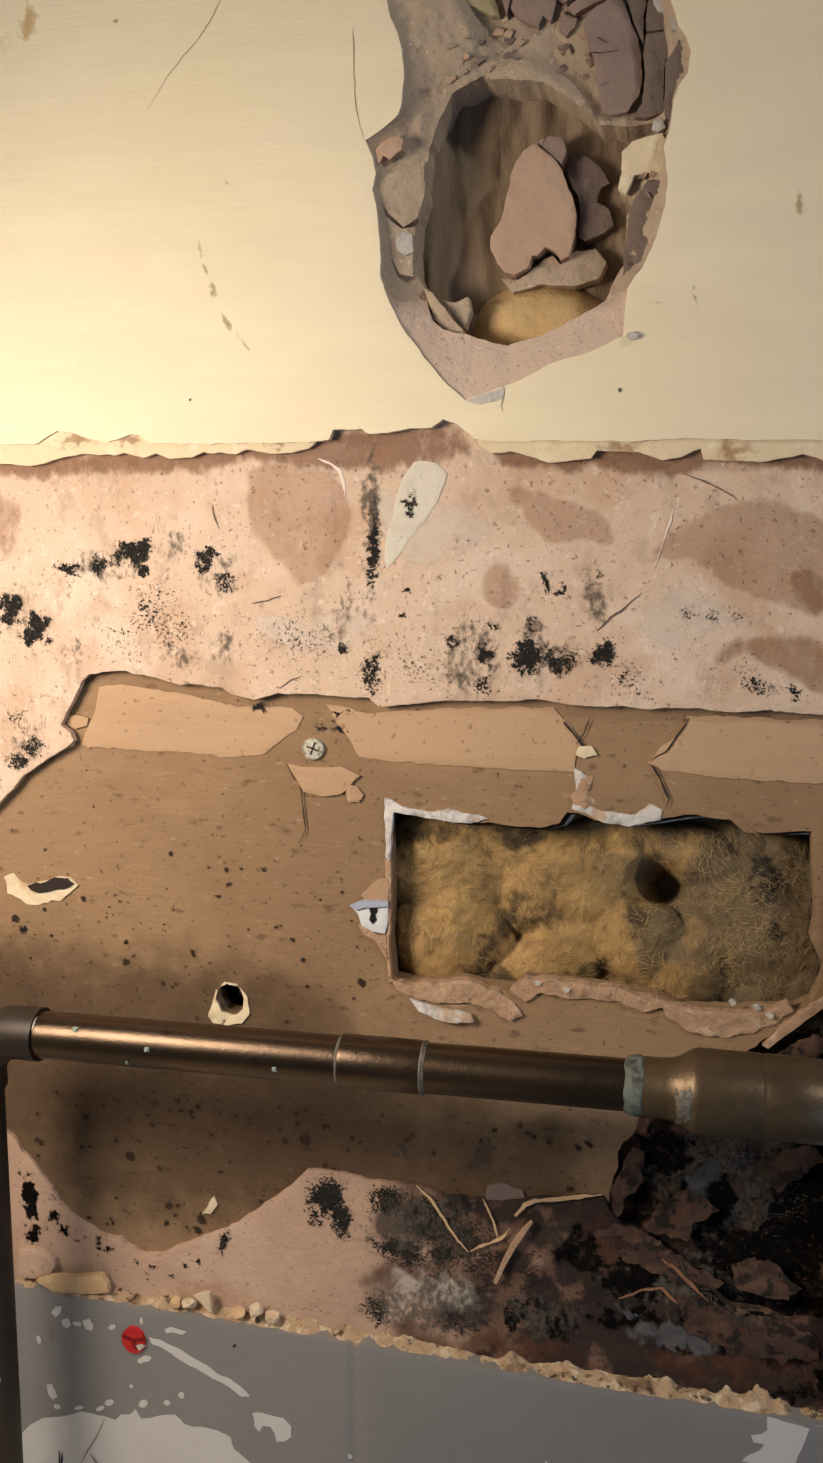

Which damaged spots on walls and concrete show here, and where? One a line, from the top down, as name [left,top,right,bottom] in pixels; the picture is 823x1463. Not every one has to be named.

crack [147,0,221,110]
spalling [366,0,691,404]
peeling [0,431,317,466]
peeling [477,438,823,463]
leakage [0,428,465,697]
mould [445,570,618,699]
spalling [4,873,79,905]
leakage [164,1202,206,1234]
leakage [303,1120,823,1359]
spalling [22,1384,250,1463]
spalling [136,1317,291,1442]
leakage [748,1356,823,1405]